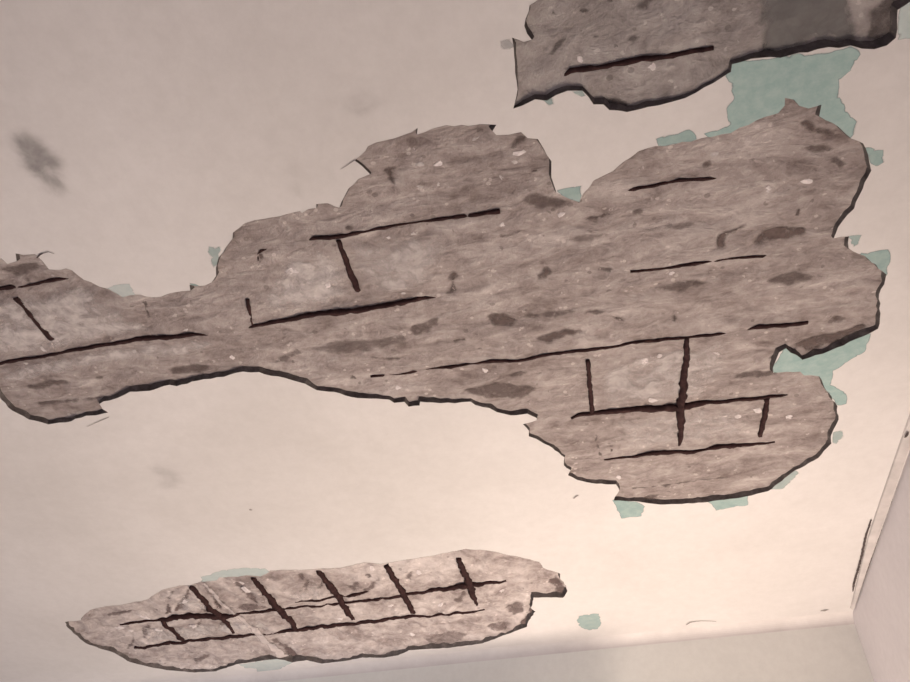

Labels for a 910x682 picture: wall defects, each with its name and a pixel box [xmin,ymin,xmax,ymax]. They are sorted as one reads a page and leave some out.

spalling [0,0,910,518]
spalling [65,549,567,673]